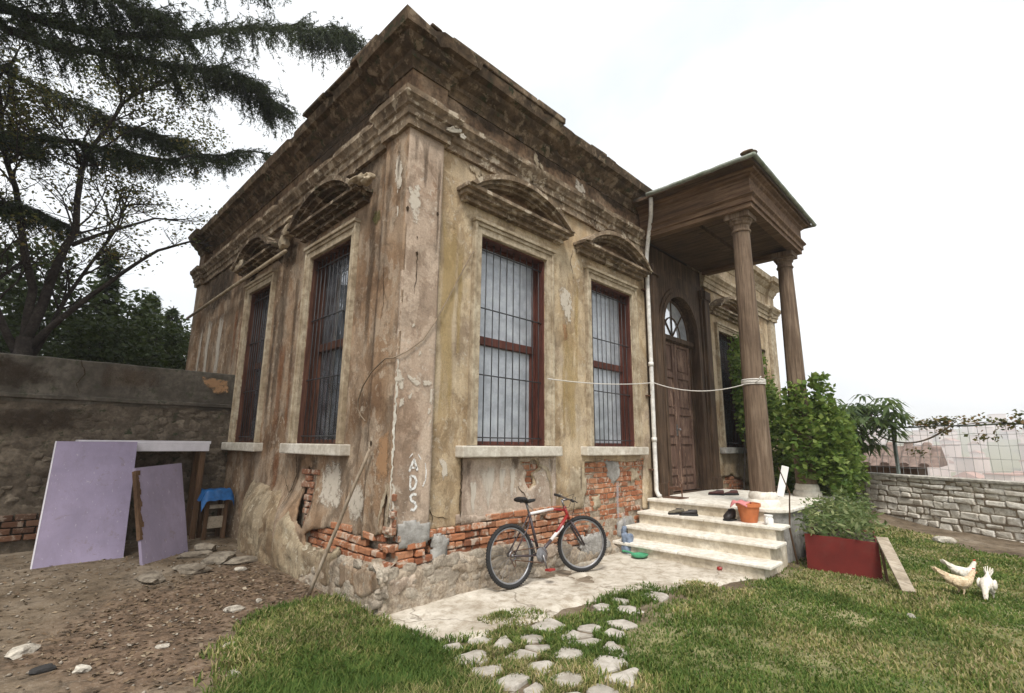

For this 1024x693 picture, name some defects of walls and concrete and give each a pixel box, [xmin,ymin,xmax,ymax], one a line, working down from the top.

flaking render [395,155,421,223]
flaking render [560,287,573,340]
flaking render [203,377,228,394]
flaking render [301,359,644,568]